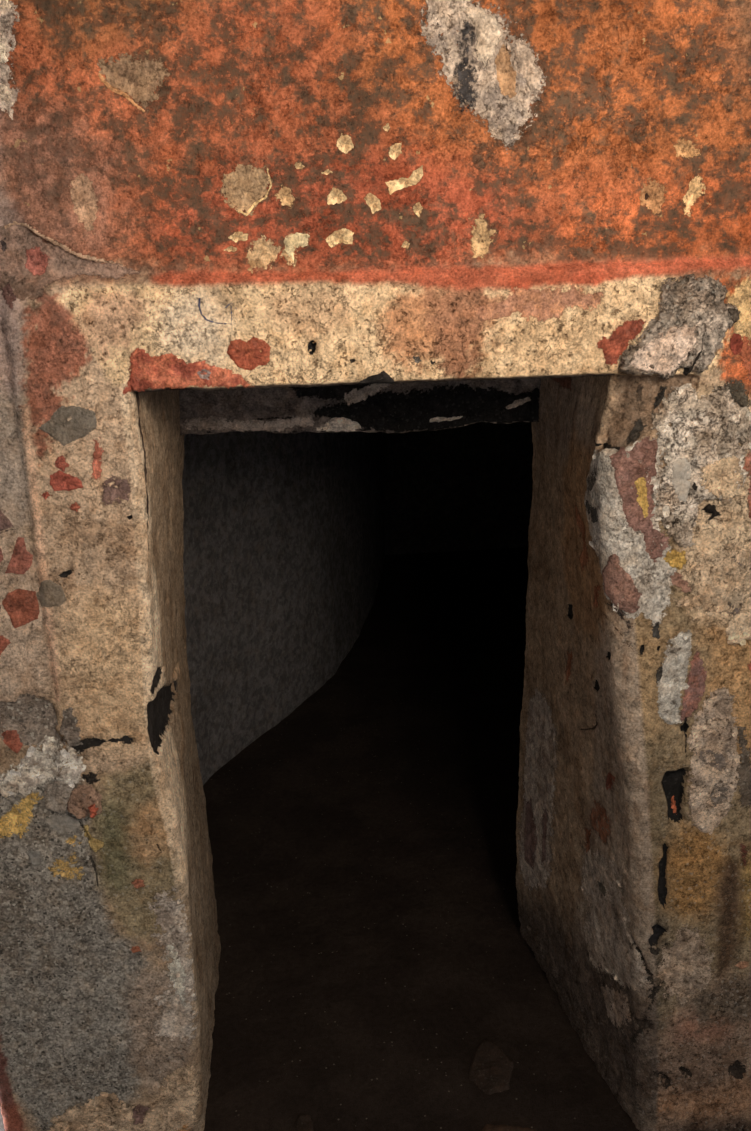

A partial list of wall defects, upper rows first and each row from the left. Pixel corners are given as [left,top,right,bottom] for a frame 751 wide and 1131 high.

peeling [420,0,547,154]
peeling [185,383,390,433]
peeling [506,397,531,409]
spalling [147,662,180,755]